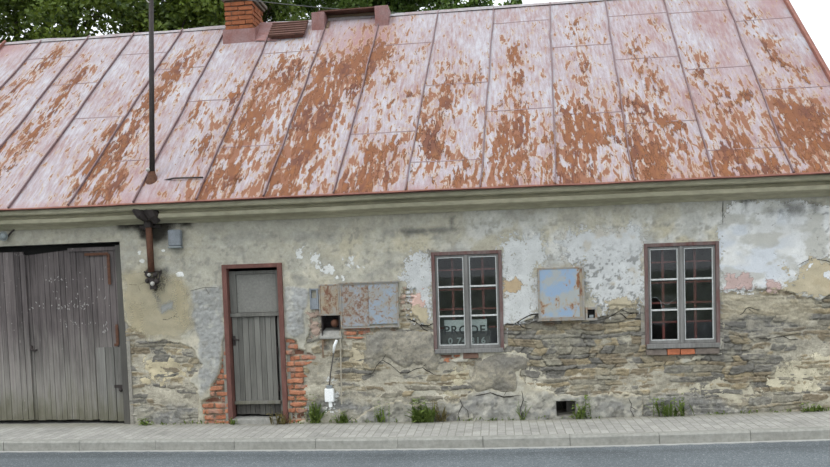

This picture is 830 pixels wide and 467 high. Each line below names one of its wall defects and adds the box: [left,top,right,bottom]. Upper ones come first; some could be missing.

corrosion [0,42,69,110]
corrosion [0,66,92,178]
corrosion [64,47,210,205]
corrosion [189,39,399,200]
corrosion [334,63,482,193]
corrosion [447,36,690,188]
corrosion [692,57,784,176]
corrosion [753,33,811,85]
corrosion [773,89,830,173]
flaking render [125,327,229,424]
flaking render [286,246,479,423]
flaking render [495,199,830,416]